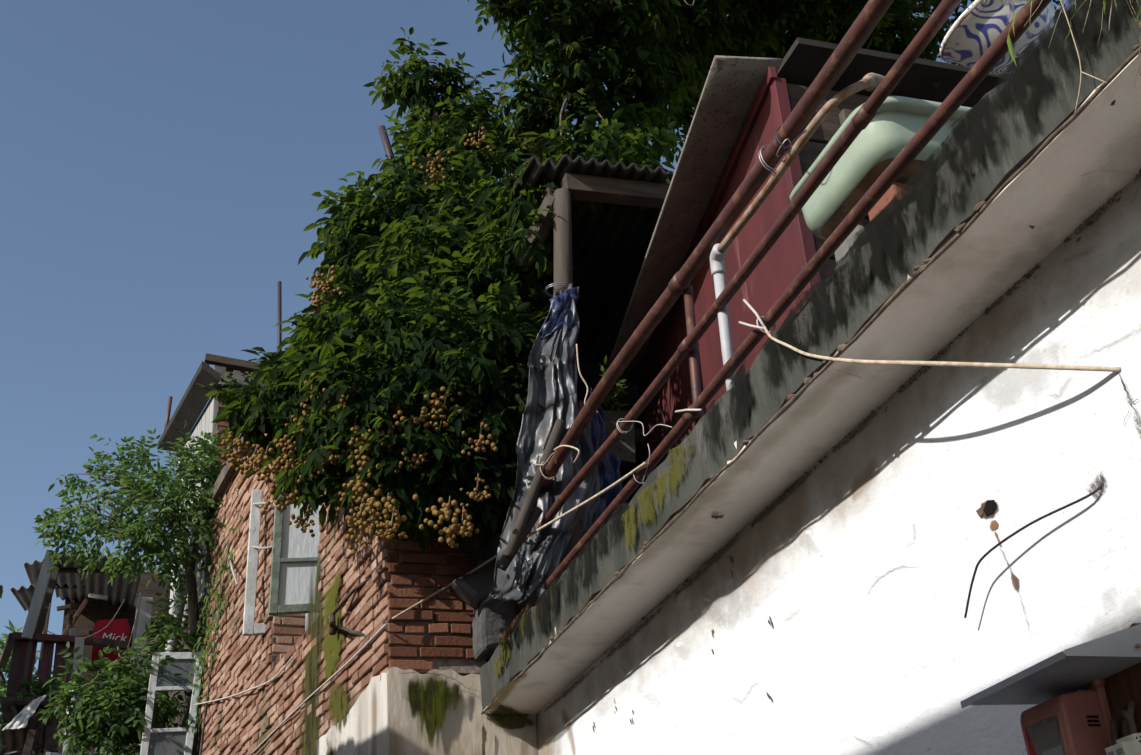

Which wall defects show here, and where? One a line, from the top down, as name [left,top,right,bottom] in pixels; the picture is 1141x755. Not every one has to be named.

water stain [763,0,1135,385]
water stain [703,361,753,457]
water stain [300,556,358,755]
water stain [409,681,459,747]
water stain [476,457,684,755]